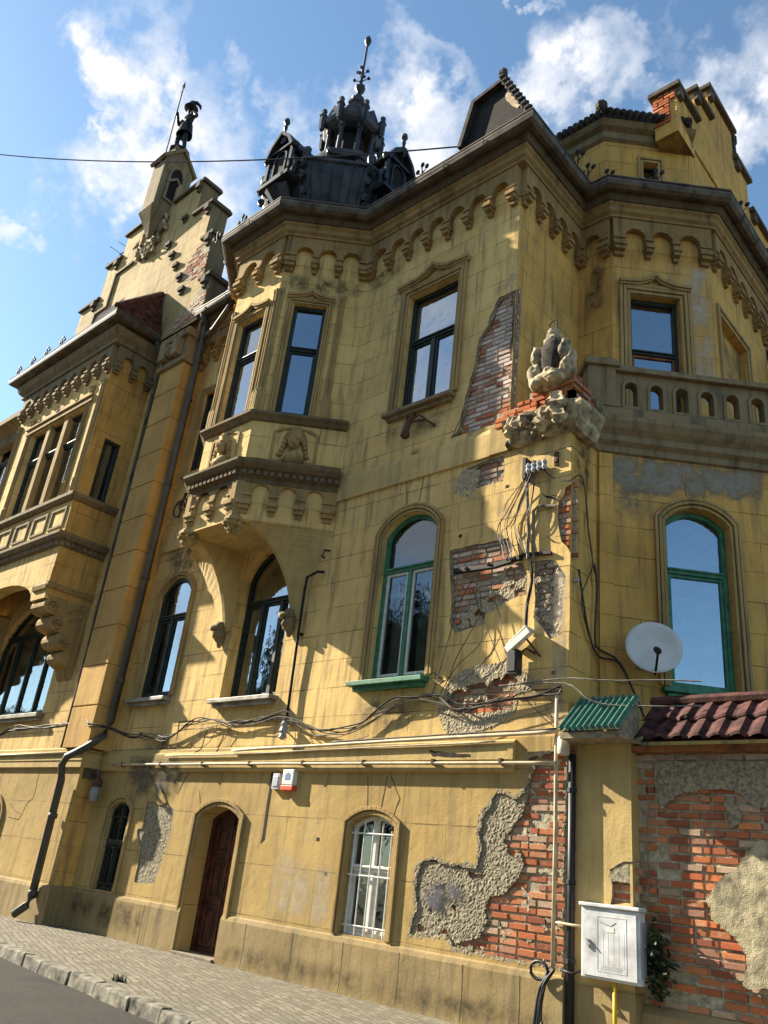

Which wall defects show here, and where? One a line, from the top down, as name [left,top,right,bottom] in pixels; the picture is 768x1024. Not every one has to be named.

flaking render [653,89,675,129]
flaking render [167,235,214,334]
flaking render [452,287,521,438]
flaking render [454,457,509,499]
spalling [558,480,580,559]
flaking render [450,534,579,639]
flaking render [437,661,536,736]
peeling [135,801,174,884]
flaking render [407,746,577,972]